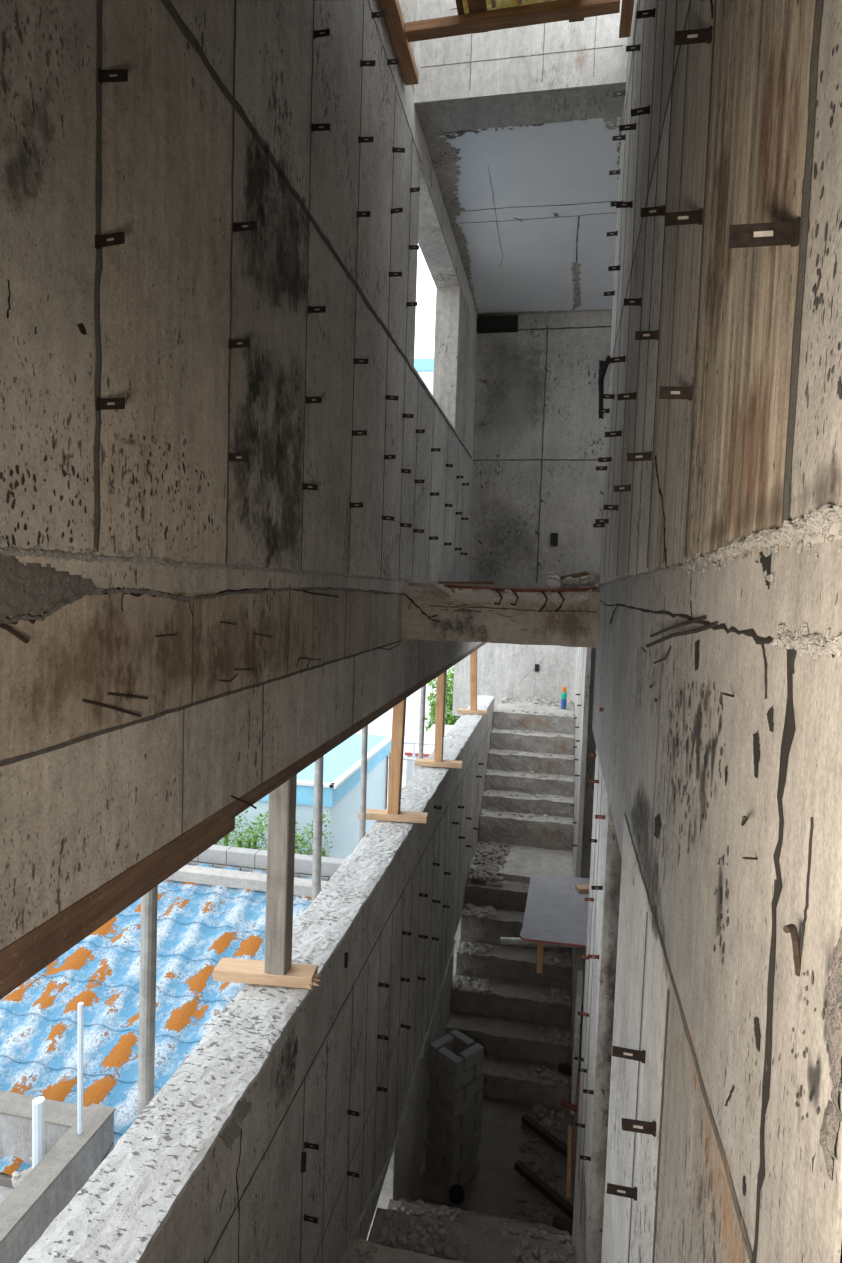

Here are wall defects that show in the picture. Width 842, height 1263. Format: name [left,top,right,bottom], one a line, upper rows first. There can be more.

leakage [240,139,308,308]
spalling [0,433,413,620]
crack [0,586,439,625]
leakage [235,346,302,563]
spalling [431,582,598,613]
spalling [686,504,842,590]
crack [600,601,842,1263]
spalling [791,927,842,1181]